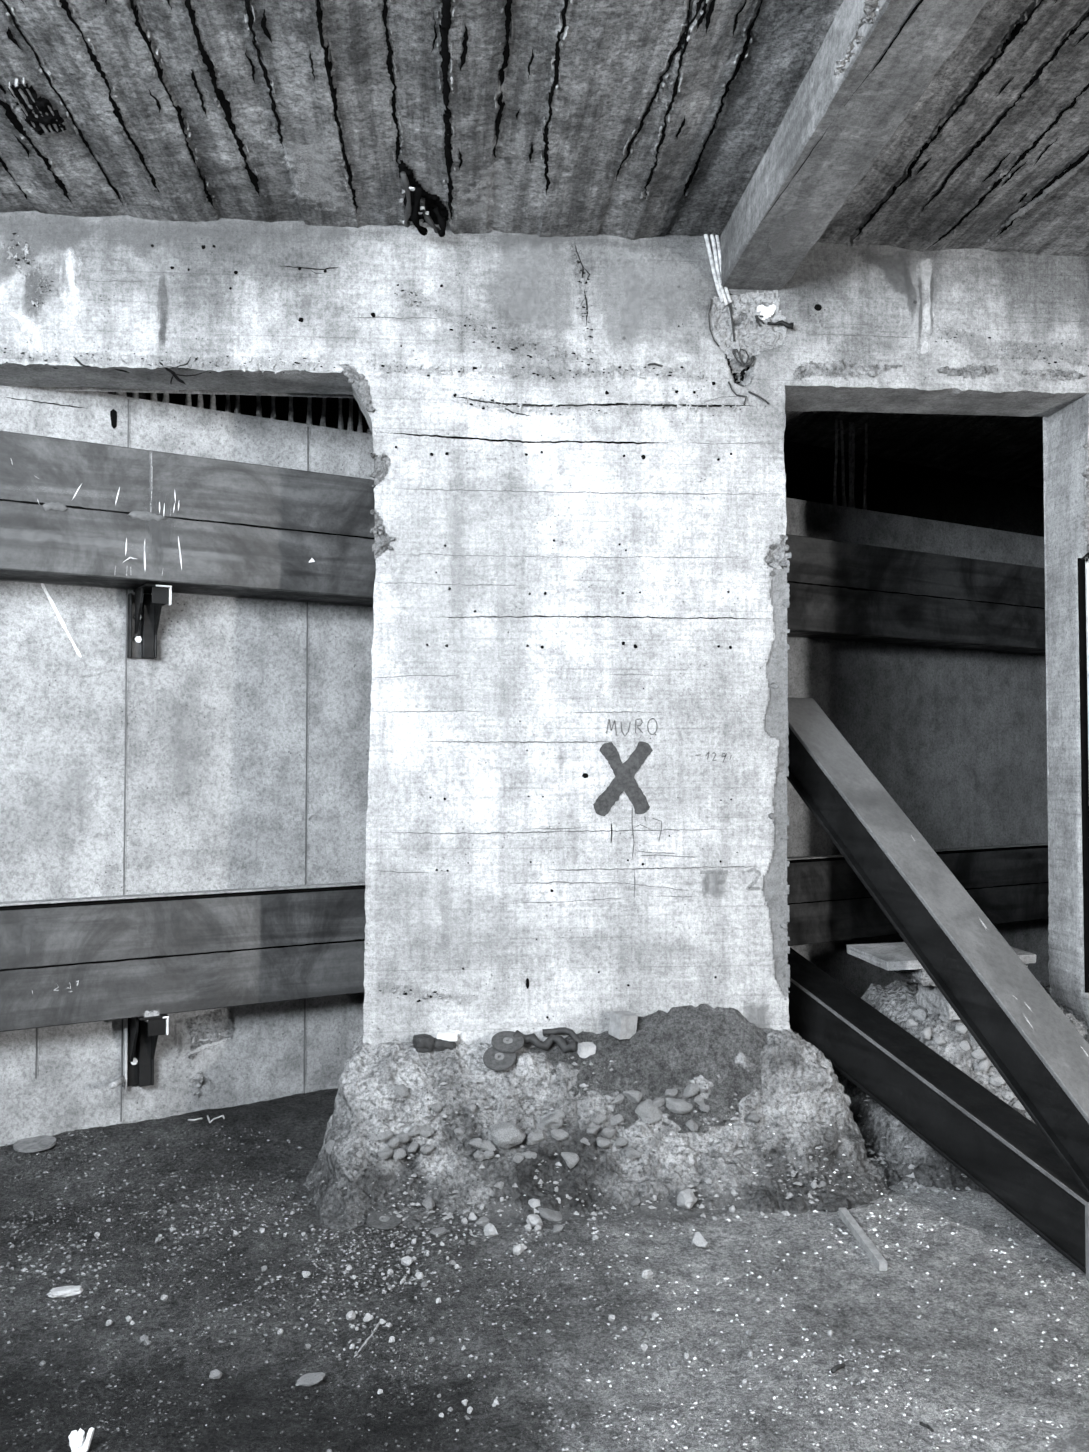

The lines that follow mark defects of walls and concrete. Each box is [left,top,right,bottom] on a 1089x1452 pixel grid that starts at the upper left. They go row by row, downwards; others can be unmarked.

crack [0,0,286,210]
crack [309,0,362,213]
crack [380,0,404,165]
crack [431,0,573,220]
crack [756,0,924,230]
spalling [834,0,882,79]
crack [851,0,1089,248]
spalling [725,329,754,386]
spalling [370,452,390,487]
spalling [370,509,395,559]
peeling [762,534,792,1000]